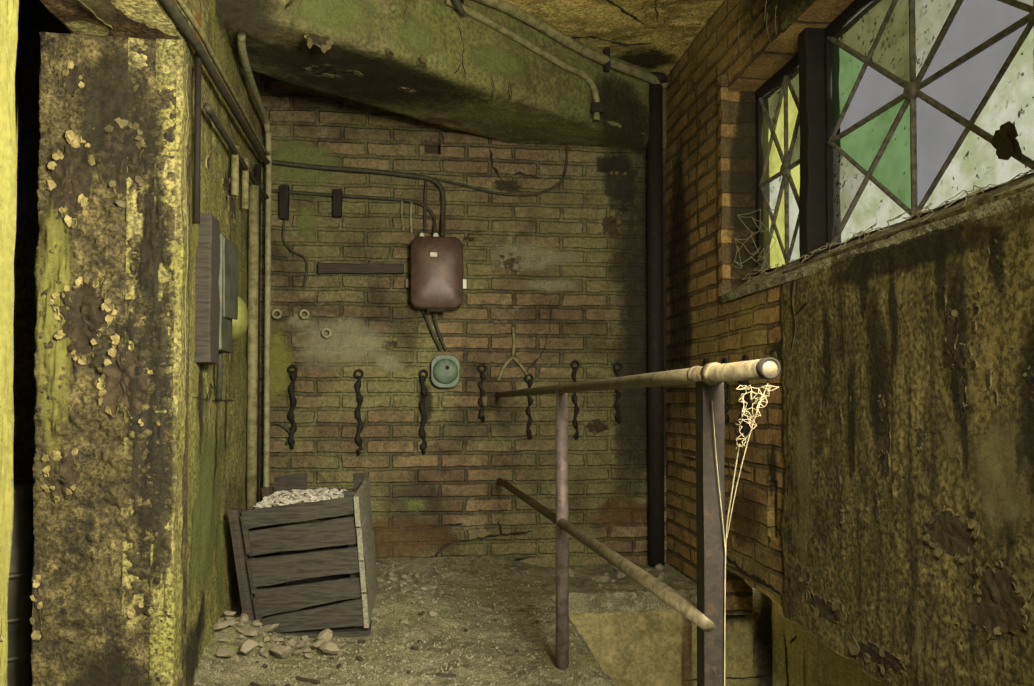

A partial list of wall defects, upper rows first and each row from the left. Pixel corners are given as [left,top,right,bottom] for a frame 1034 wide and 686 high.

leakage [7,0,19,132]
crack [571,0,658,46]
leakage [0,414,11,686]
leakage [74,47,175,601]
leakage [596,77,650,490]
leakage [795,360,811,578]
leakage [823,310,831,403]
leakage [839,221,1003,476]
leakage [1017,330,1034,489]